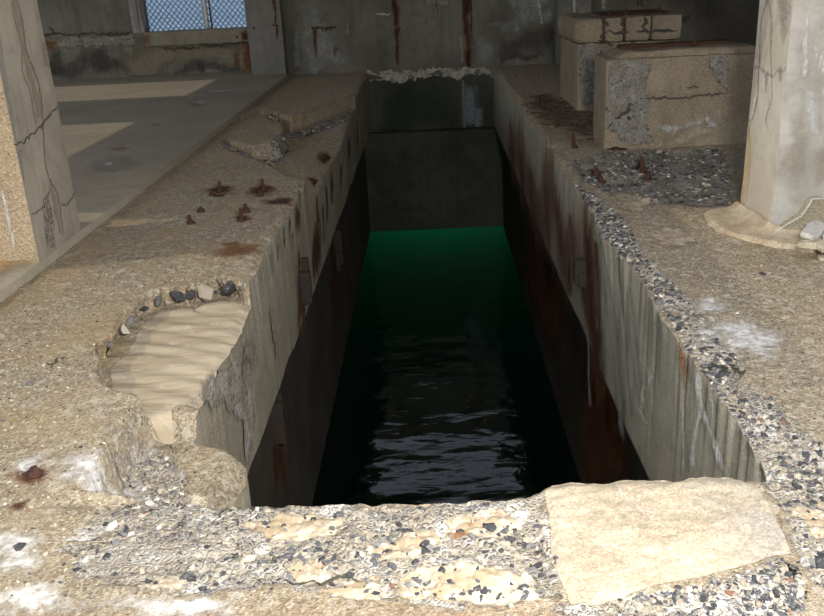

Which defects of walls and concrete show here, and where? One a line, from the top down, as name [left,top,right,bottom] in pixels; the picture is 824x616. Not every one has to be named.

rust [392,0,400,65]
rust [462,0,472,67]
crack [598,17,678,46]
crack [745,0,772,140]
crack [14,1,133,231]
rust [521,94,594,144]
crack [607,85,728,129]
spalling [43,184,62,250]
rust [508,121,630,484]
spalling [57,66,563,611]
spalling [369,60,824,616]
damp [115,596,232,616]